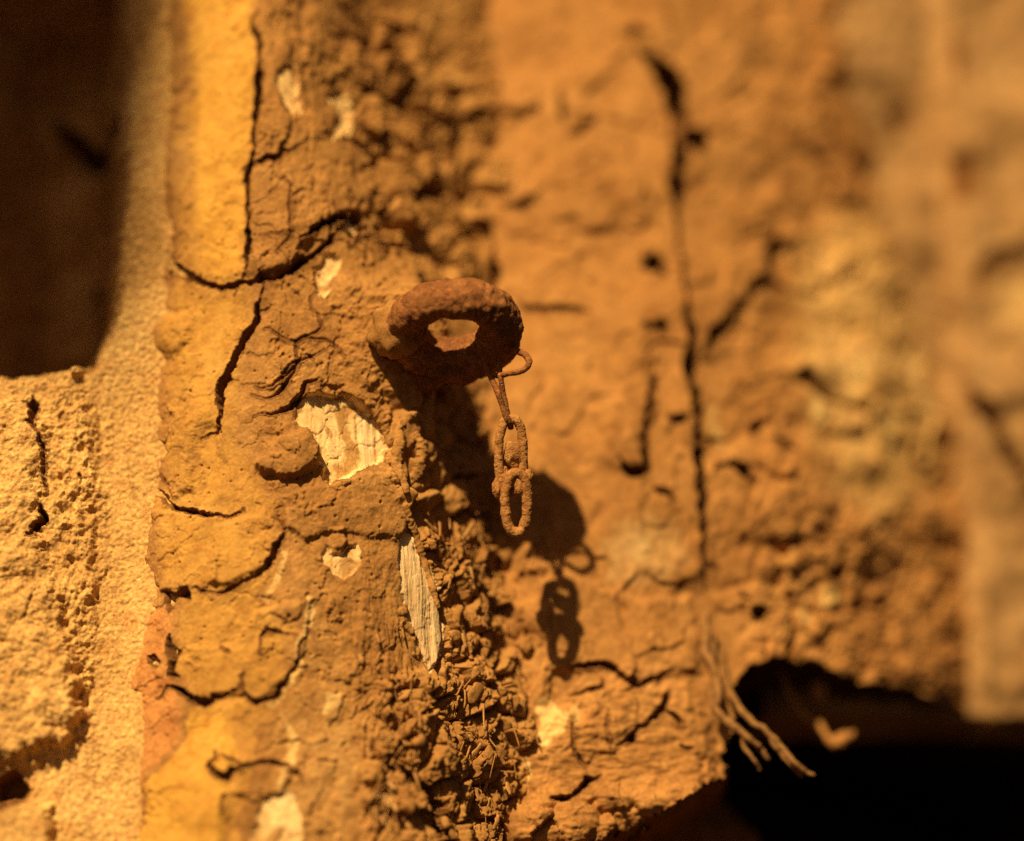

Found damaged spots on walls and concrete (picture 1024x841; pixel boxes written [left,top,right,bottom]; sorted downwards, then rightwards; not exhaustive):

crack [165,9,382,439]
crack [616,0,856,593]
crack [24,395,50,537]
crack [156,489,287,596]
peeling [293,386,441,608]
rust [492,477,501,499]
rust [503,441,534,499]
crack [738,590,800,624]
crack [155,624,313,709]